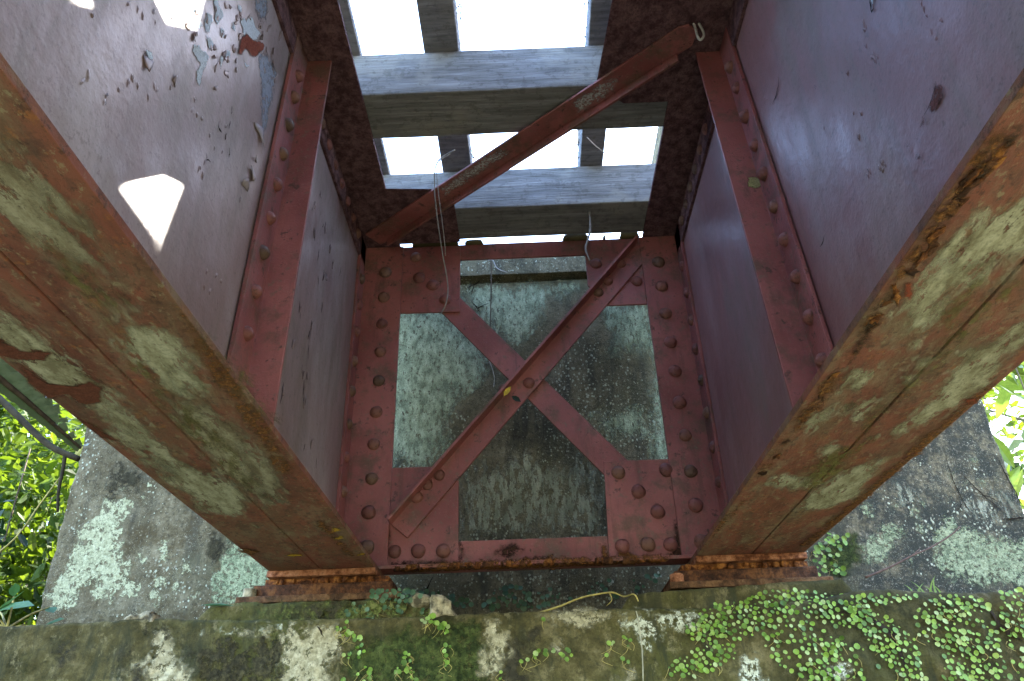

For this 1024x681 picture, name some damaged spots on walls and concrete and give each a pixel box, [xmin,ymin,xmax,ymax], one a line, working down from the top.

peeling [173,0,283,192]
damp [0,142,288,516]
rust [0,341,102,405]
rust [76,417,119,441]
damp [206,532,234,562]
damp [120,627,191,681]
damp [229,601,348,681]
damp [478,619,513,676]
damp [551,608,610,628]
damp [621,610,702,651]
damp [740,656,769,681]